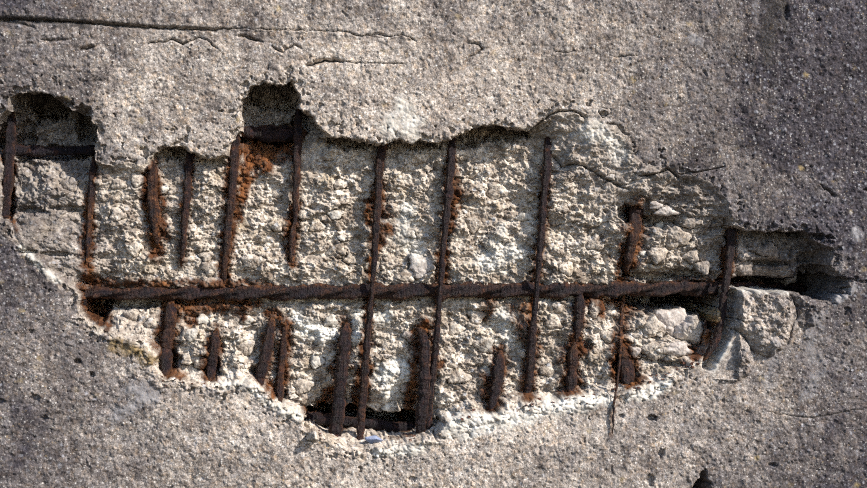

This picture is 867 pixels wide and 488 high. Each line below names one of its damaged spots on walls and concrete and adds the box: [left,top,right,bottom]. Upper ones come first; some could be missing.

crack [1,18,413,66]
corrosion [1,109,808,440]
spalling [0,81,848,452]
crack [554,158,724,189]